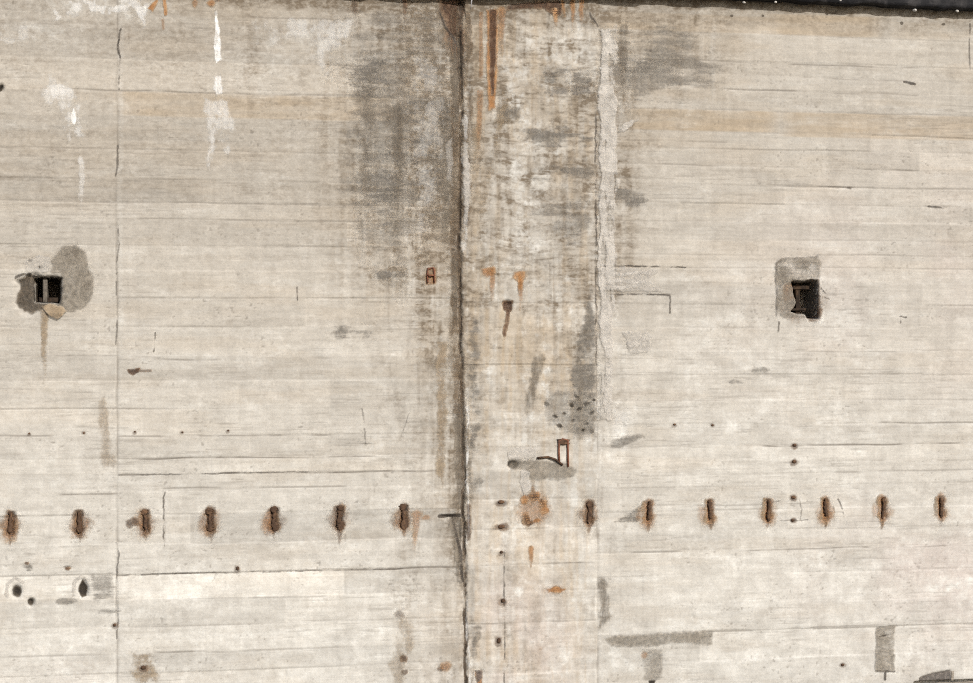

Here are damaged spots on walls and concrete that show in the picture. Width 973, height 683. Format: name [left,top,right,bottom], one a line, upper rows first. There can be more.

rust [477,0,584,127]
damp [528,129,593,147]
spalling [15,255,66,319]
crack [438,0,468,683]
damp [570,304,596,395]
rust [3,510,17,541]
rust [73,509,84,537]
rust [127,508,150,535]
rust [204,506,217,535]
rust [520,486,549,526]